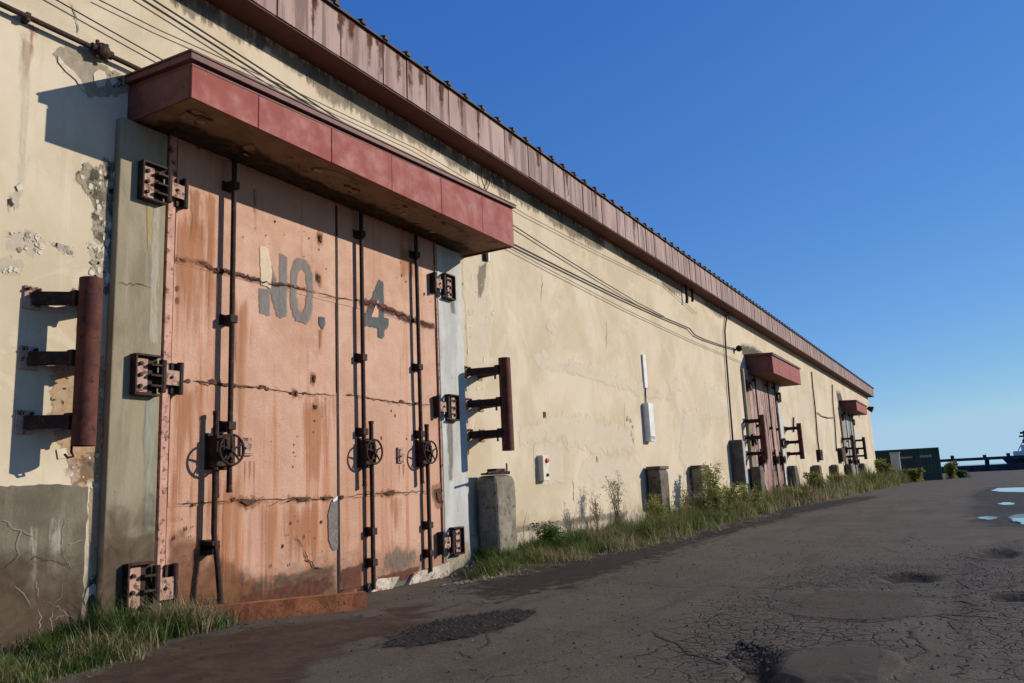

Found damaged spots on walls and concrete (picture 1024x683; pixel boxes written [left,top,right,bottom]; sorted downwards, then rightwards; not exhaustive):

rust [339,13,355,37]
peeling [53,46,130,98]
rust [367,32,385,73]
peeling [76,158,114,294]
crack [174,257,435,329]
peeling [49,365,74,415]
crack [184,379,434,406]
peeling [55,356,105,627]
crack [177,490,433,506]
rust [252,495,363,595]
rust [378,546,420,581]
water stain [0,553,83,656]